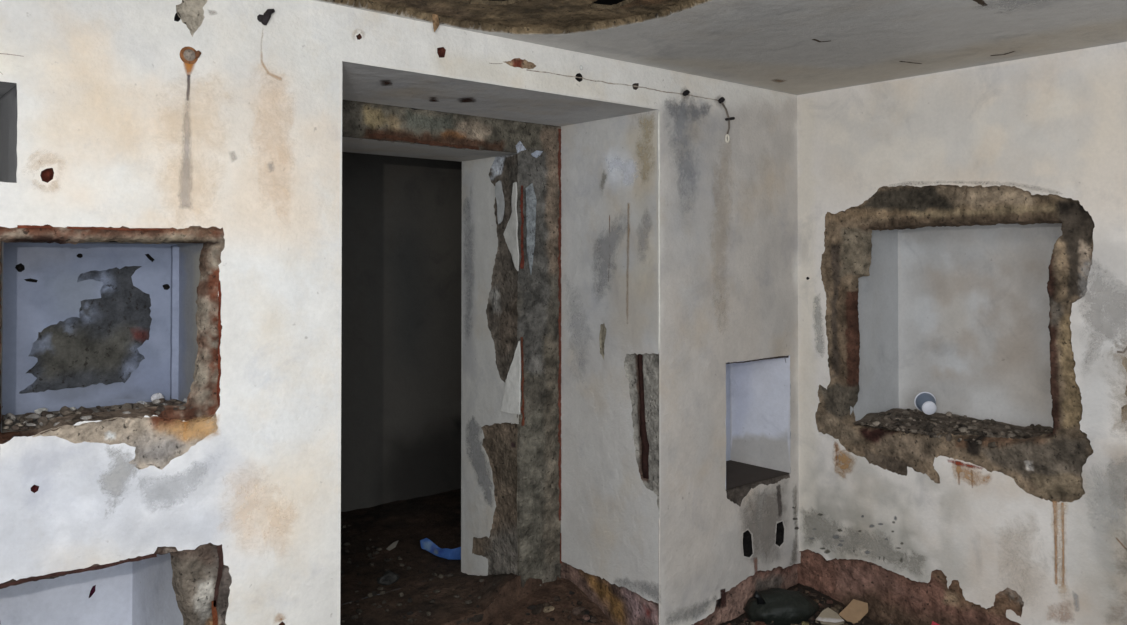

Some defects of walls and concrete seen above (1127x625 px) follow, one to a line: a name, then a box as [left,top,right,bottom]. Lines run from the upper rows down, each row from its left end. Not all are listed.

spalling [174,0,207,37]
peeling [495,180,537,274]
spalling [0,224,225,470]
peeling [500,341,521,415]
spalling [806,184,1095,503]
spalling [624,353,659,509]
spalling [0,543,232,625]
flaking render [561,562,659,625]
spalling [743,530,753,557]
flaking render [692,549,1024,625]
rust [1053,501,1078,620]